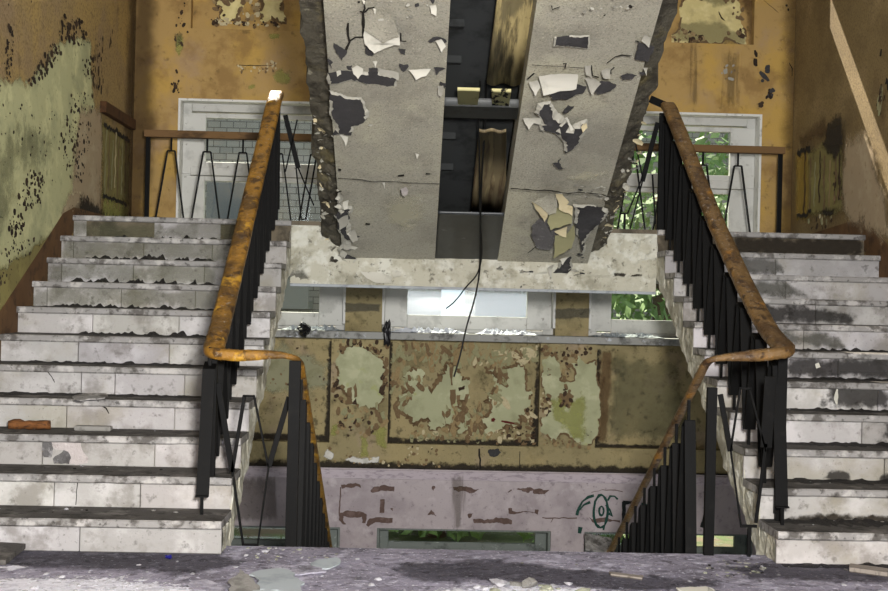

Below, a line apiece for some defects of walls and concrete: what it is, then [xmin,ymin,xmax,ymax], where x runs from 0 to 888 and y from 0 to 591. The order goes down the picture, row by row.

spalling [299,0,447,283]
spalling [520,0,775,279]
damp [785,0,843,233]
peeling [324,339,601,468]